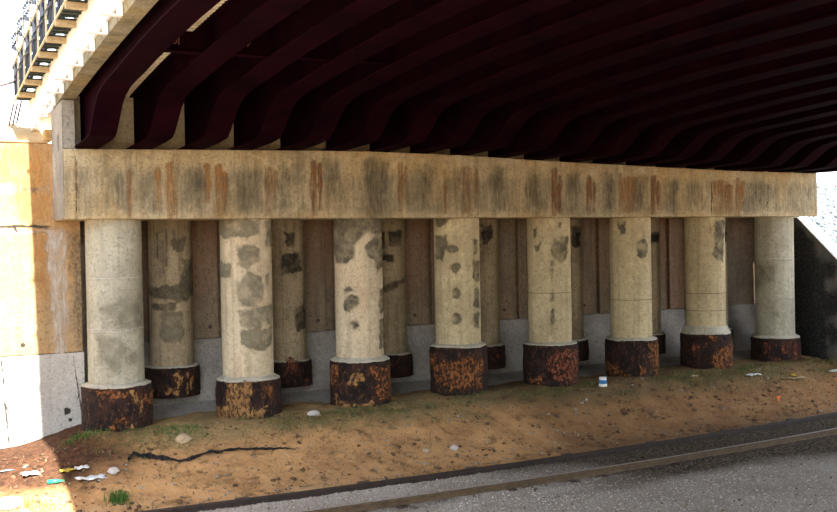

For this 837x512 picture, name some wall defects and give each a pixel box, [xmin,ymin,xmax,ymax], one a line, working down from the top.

corrosion [204,164,227,210]
corrosion [311,160,322,214]
corrosion [552,169,561,215]
corrosion [587,176,595,205]
water stain [777,227,837,360]
crack [0,360,9,443]